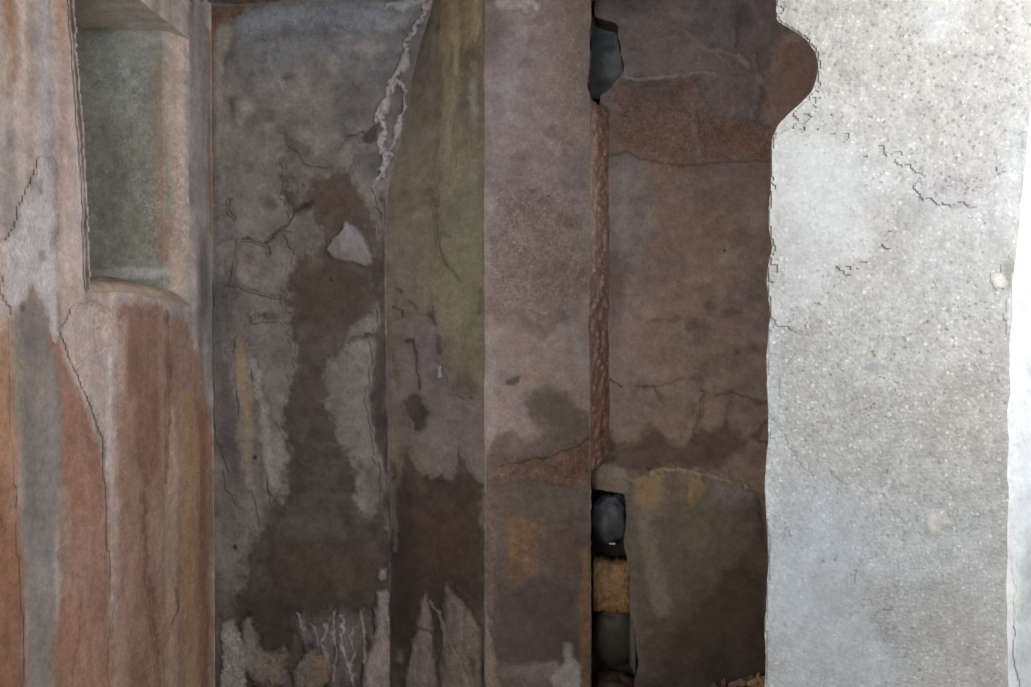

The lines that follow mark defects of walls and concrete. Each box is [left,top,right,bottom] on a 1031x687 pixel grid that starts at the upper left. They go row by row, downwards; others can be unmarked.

rust [0,313,24,687]
rust [52,294,215,687]
crack [215,161,315,300]
water stain [207,0,591,687]
crack [608,375,768,446]